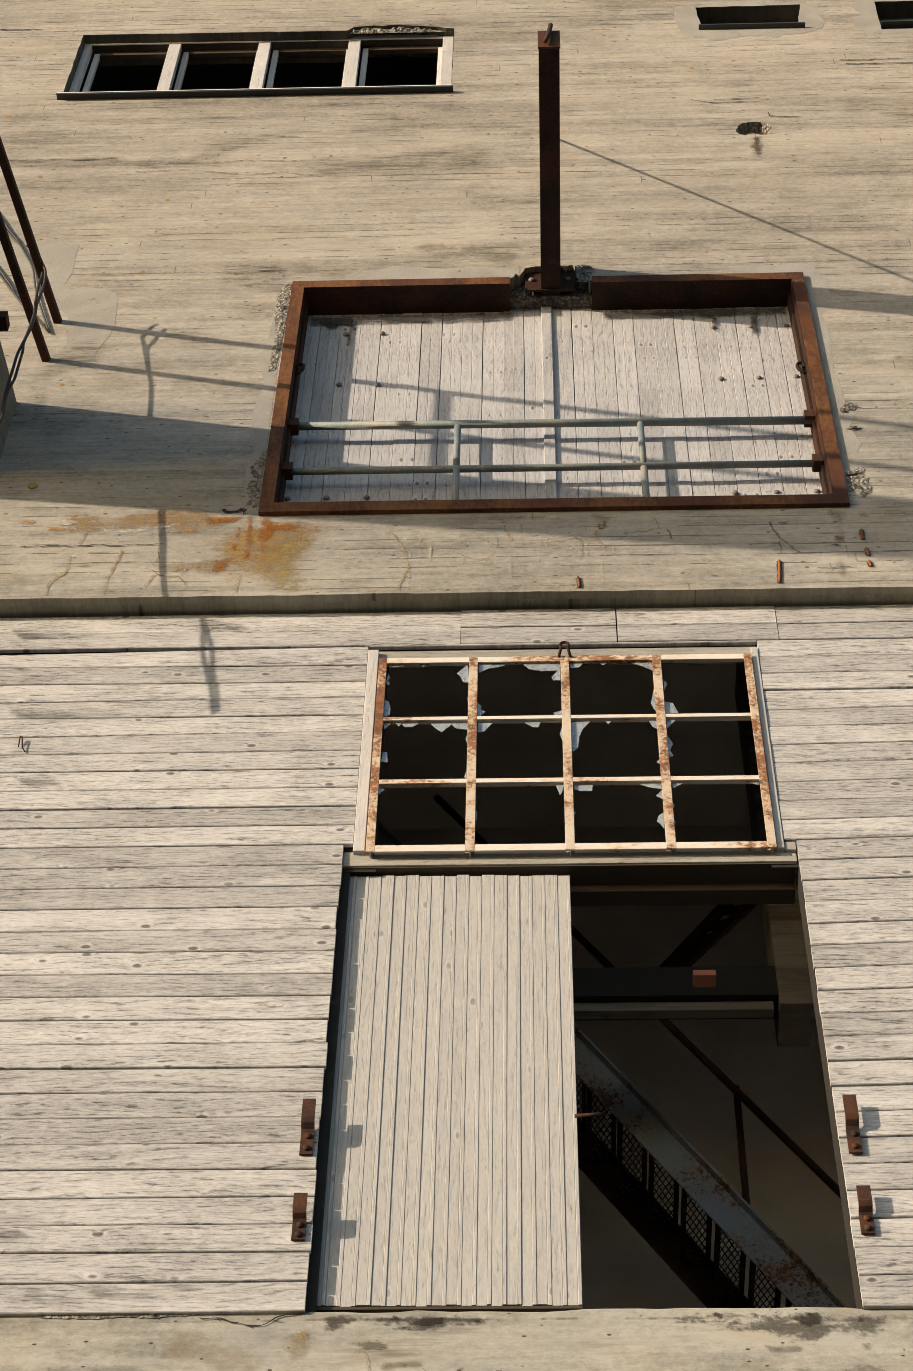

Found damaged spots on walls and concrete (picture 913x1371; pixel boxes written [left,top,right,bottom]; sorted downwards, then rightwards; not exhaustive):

corrosion [29,511,317,572]
damp [793,1312,821,1326]